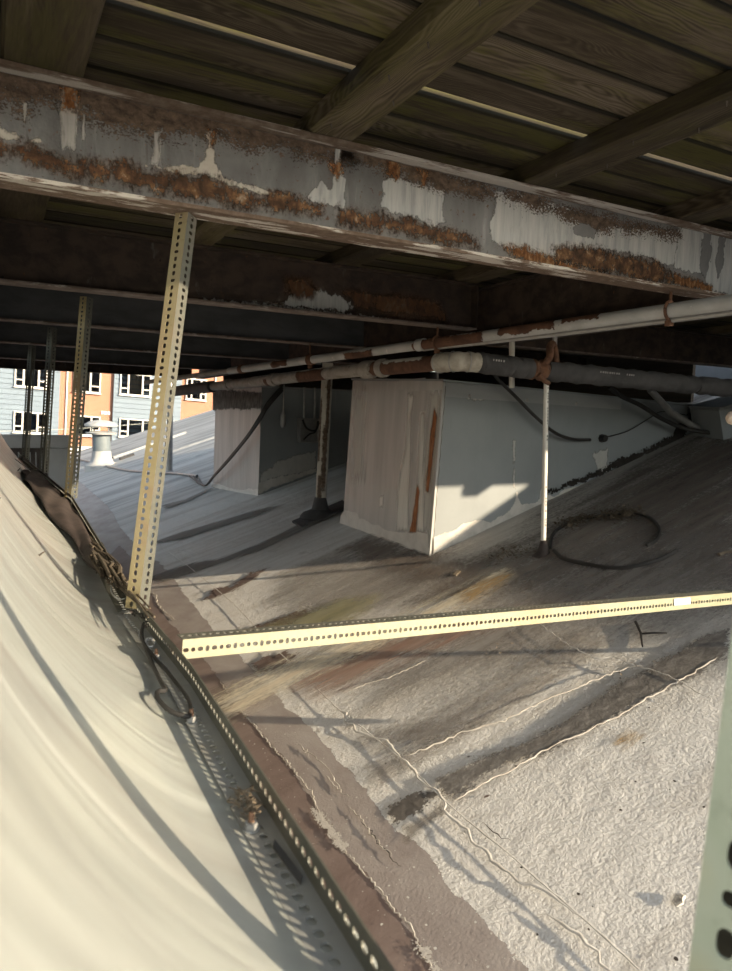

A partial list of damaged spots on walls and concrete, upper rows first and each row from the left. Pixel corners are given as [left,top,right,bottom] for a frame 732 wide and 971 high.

peeling [0,128,19,140]
corrosion [0,72,480,251]
corrosion [76,89,713,291]
peeling [381,177,446,228]
peeling [490,191,732,294]
peeling [204,289,374,317]
corrosion [284,276,316,300]
corrosion [344,331,483,376]
corrosion [497,313,601,336]
corrosion [410,409,437,533]
peeling [340,486,578,556]
peeling [74,478,528,971]